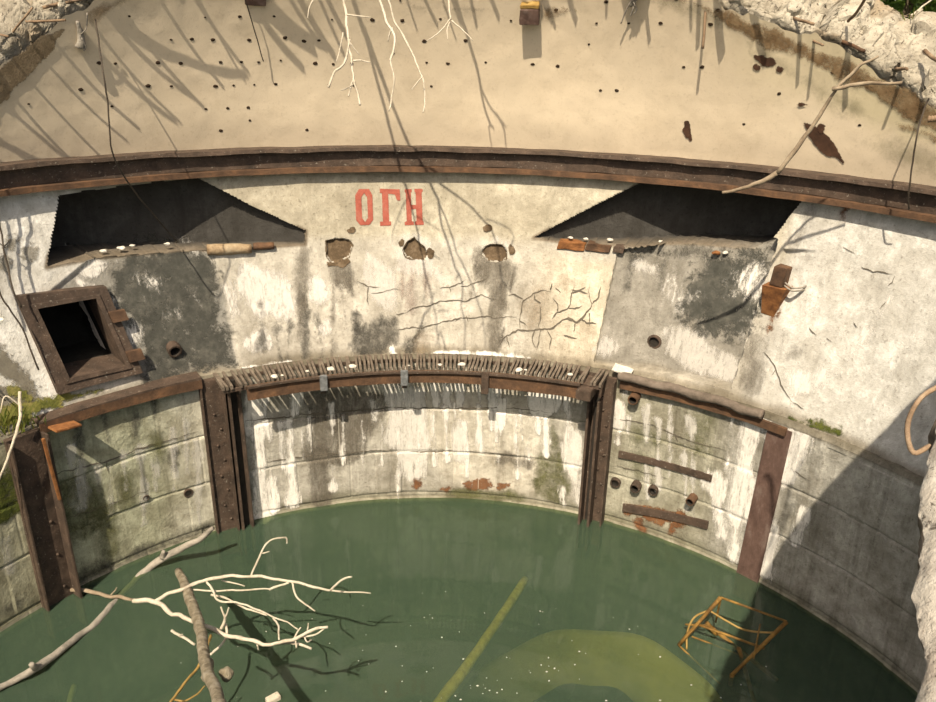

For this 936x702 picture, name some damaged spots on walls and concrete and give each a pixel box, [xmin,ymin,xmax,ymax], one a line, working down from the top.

spalling [0,0,110,104]
corrosion [753,55,783,73]
spalling [701,0,936,143]
corrosion [682,121,692,141]
peeling [804,123,844,163]
spalling [398,237,434,260]
leakage [76,234,352,383]
crack [396,277,601,349]
leakage [663,246,773,387]
leakage [243,383,582,520]
corrosion [463,478,510,491]
corrosion [624,505,686,535]